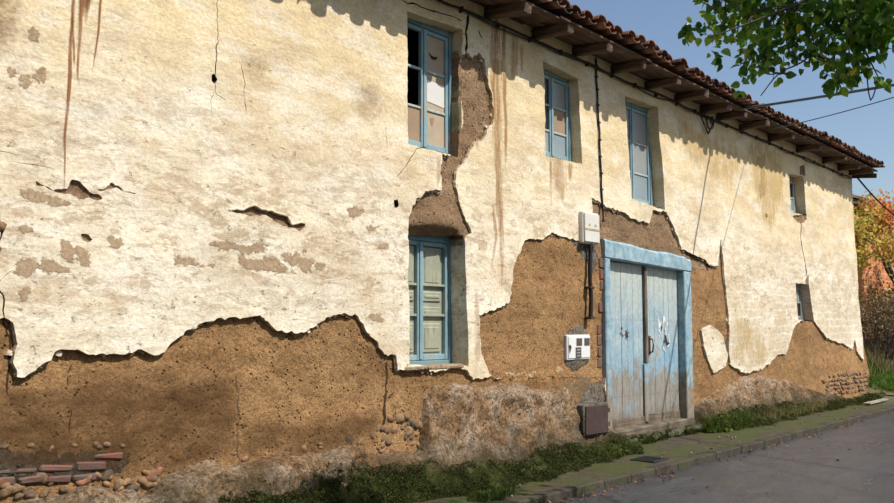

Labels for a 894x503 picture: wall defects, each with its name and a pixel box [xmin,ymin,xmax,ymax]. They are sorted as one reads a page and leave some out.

peeling [19,180,134,207]
rust [64,0,102,185]
spalling [408,50,493,246]
crack [0,269,16,392]
crack [382,362,395,425]
spalling [0,198,870,495]
spalling [0,481,77,503]